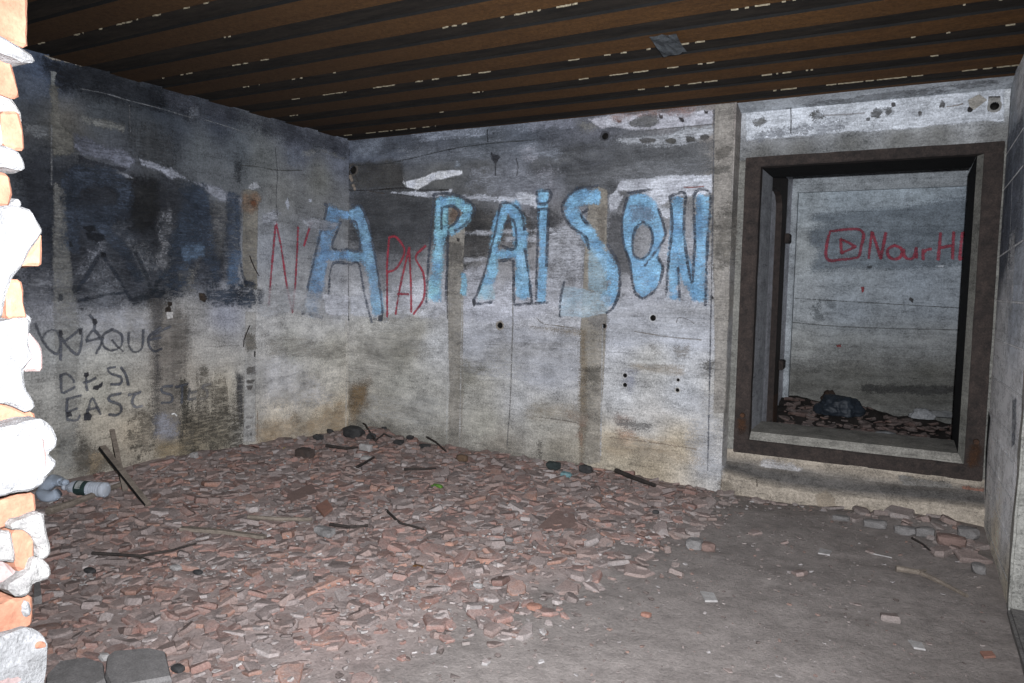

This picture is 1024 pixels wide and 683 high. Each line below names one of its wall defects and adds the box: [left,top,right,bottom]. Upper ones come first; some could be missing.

damp [125,299,244,459]
damp [256,402,410,442]